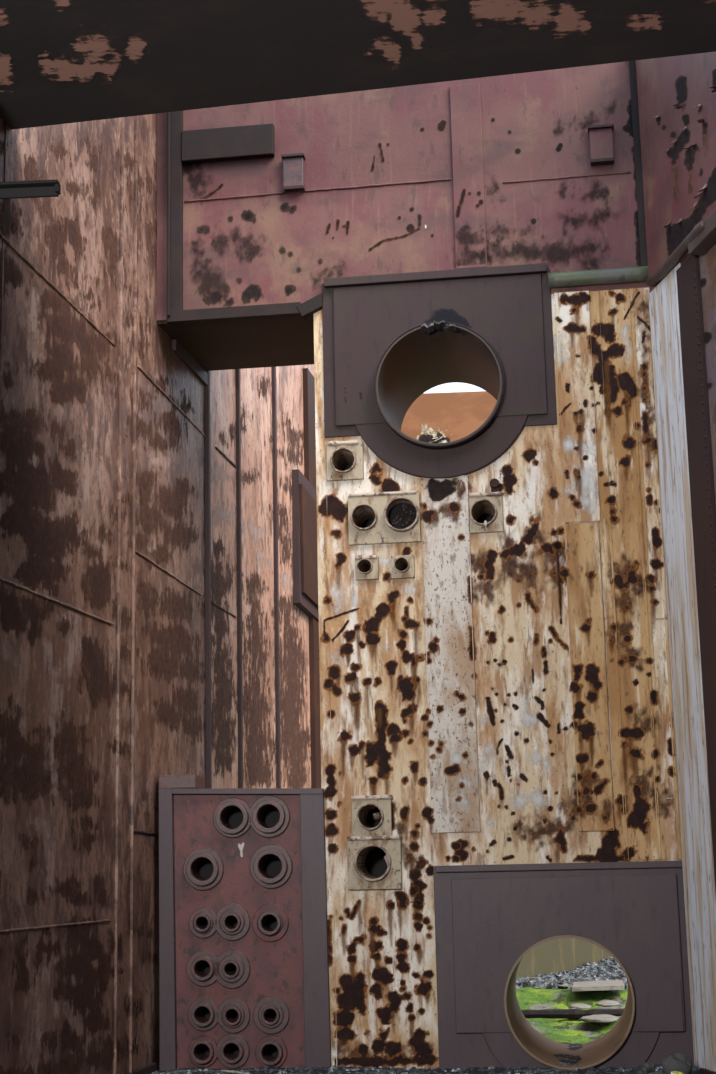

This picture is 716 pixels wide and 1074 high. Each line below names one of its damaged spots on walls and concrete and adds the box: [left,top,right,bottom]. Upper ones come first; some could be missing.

peeling [38,34,147,84]
peeling [360,0,446,64]
peeling [468,0,592,39]
peeling [653,76,716,268]
water stain [26,289,43,412]
water stain [75,442,100,539]
rust [0,135,311,788]
water stain [150,448,170,474]
rust [559,290,658,478]
water stain [29,609,82,899]
rust [320,572,476,1068]
rust [553,663,675,863]